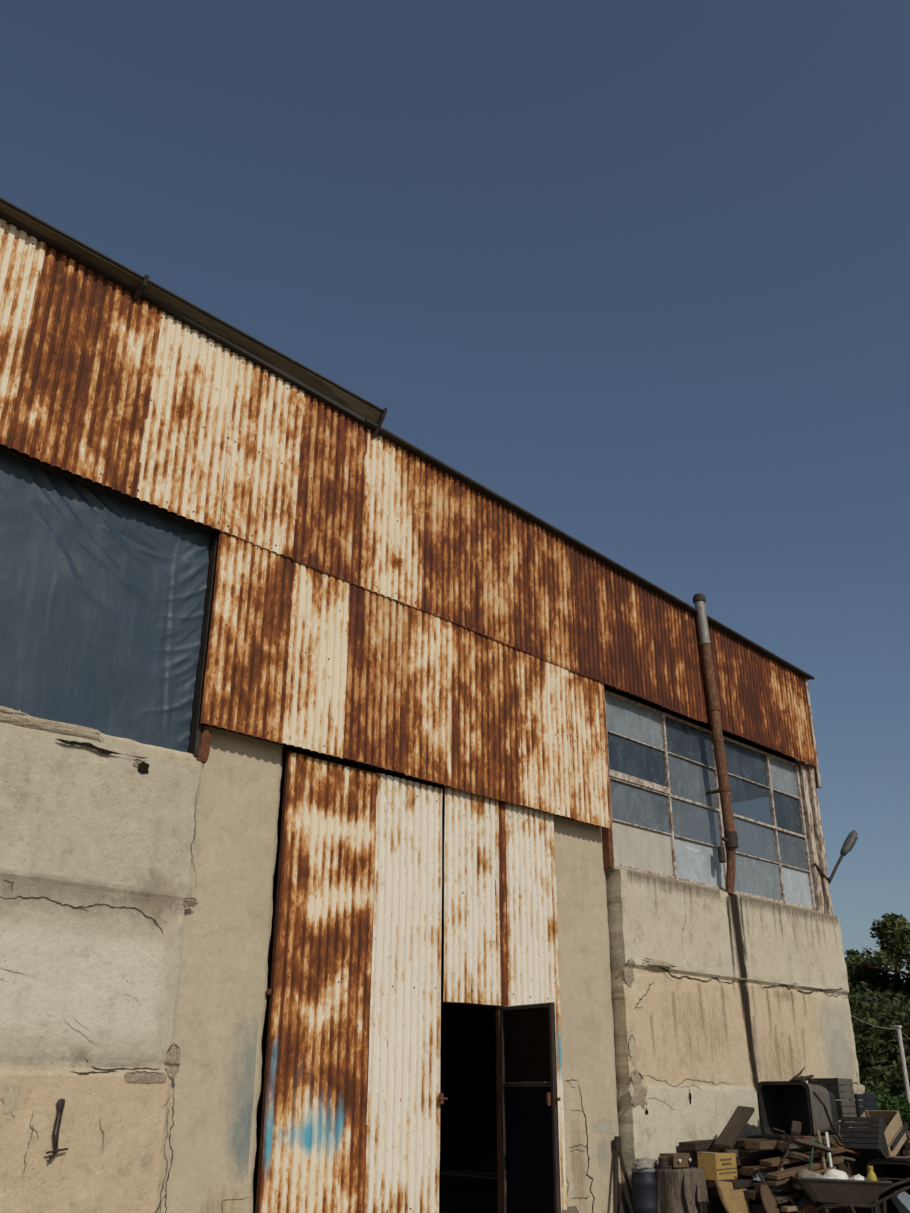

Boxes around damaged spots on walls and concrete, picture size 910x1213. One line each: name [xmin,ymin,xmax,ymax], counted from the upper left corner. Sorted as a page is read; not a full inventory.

spalling [0,706,104,741]
crack [0,879,163,933]
crack [635,919,851,1009]
crack [22,1114,39,1178]
crack [63,1018,175,1213]
crack [566,1079,595,1211]
spalling [628,1035,648,1110]
crack [646,1075,741,1110]